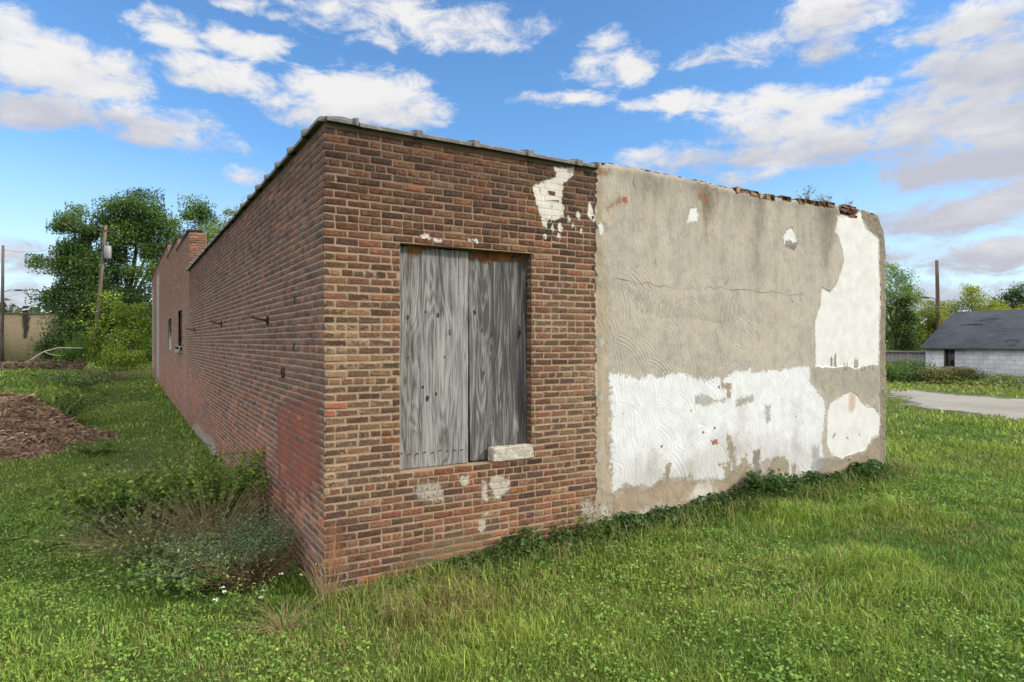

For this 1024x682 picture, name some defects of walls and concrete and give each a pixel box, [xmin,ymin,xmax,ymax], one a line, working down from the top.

peeling [532,166,604,239]
crack [614,257,803,303]
peeling [596,204,886,526]